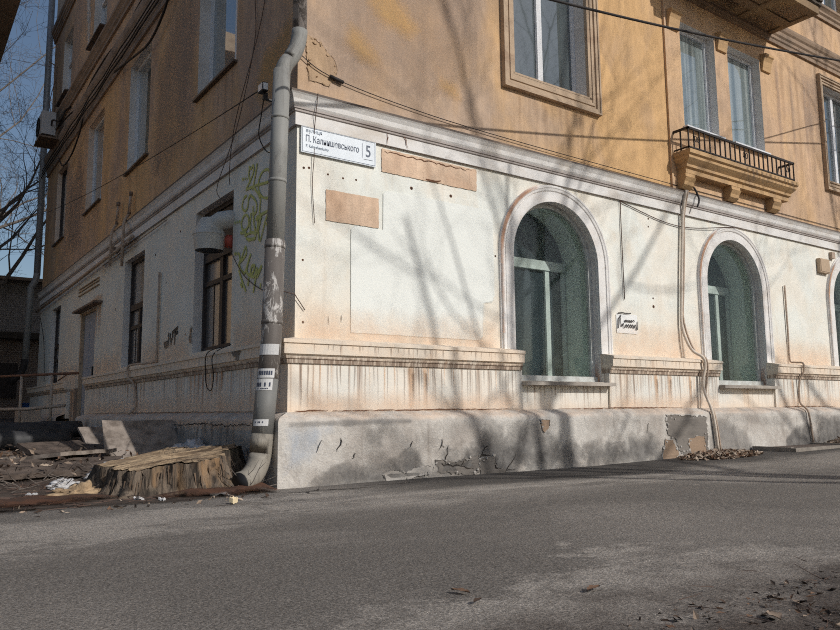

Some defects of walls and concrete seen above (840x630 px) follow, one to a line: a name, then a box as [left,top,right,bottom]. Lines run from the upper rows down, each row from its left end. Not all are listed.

peeling [306,35,337,87]
leakage [321,454,418,486]
crack [288,440,516,494]
leakage [443,426,578,477]
leakage [589,438,662,466]
spalling [662,414,709,459]